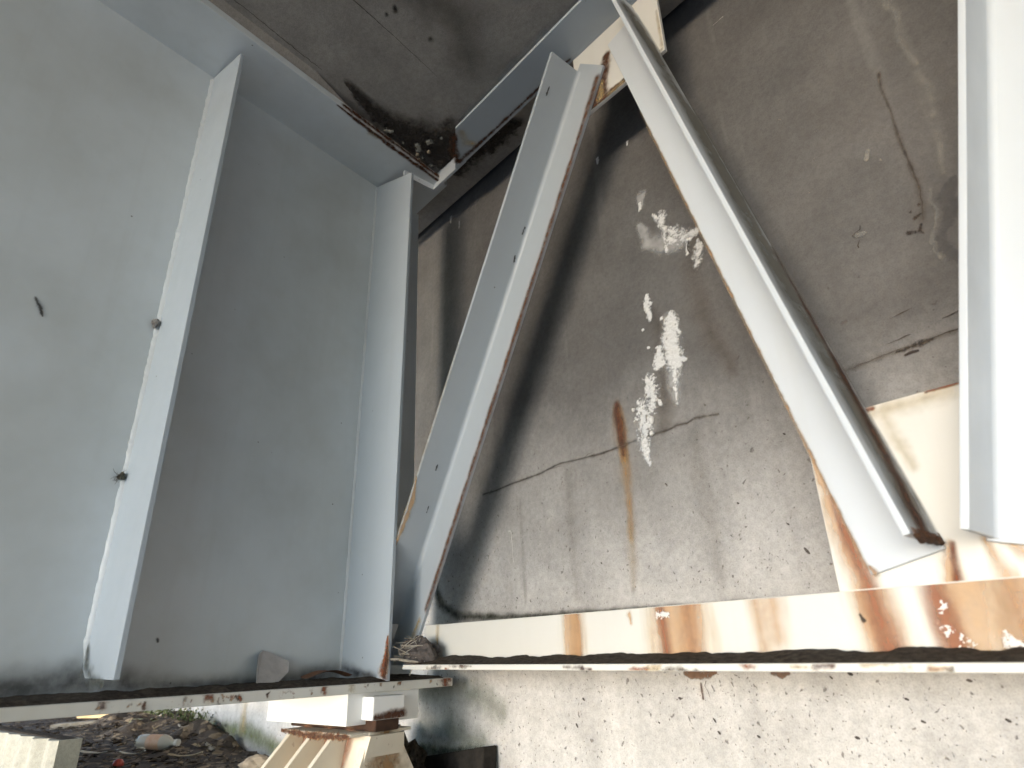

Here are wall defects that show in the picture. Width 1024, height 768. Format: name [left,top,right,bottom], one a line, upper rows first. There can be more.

corrosion [337,104,439,182]
efflorescence [637,192,704,267]
corrosion [425,51,625,611]
efflorescence [631,293,687,467]
corrosion [615,402,631,535]
corrosion [772,248,988,652]
corrosion [563,614,591,670]
corrosion [656,604,701,654]
corrosion [998,572,1024,647]